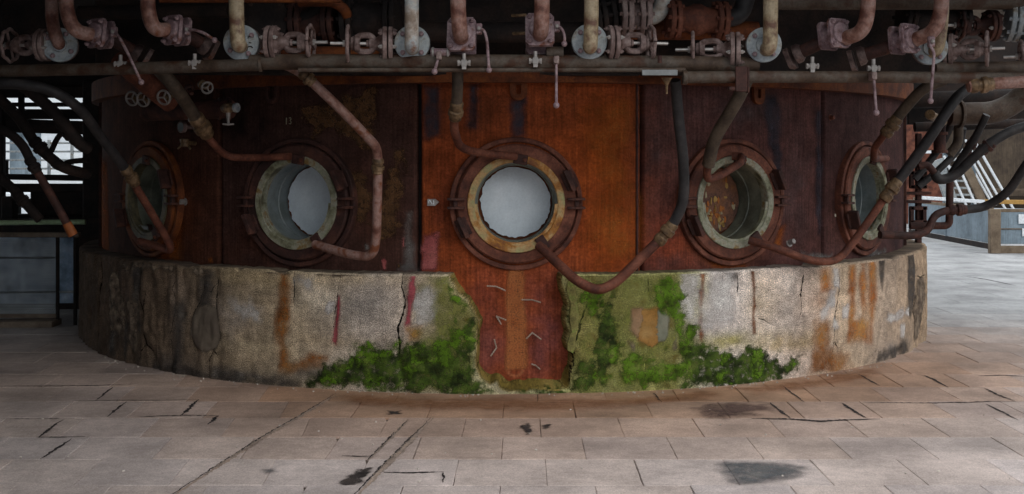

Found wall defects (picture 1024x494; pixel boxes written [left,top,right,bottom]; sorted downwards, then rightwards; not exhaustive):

rust [275,275,323,369]
crack [397,277,406,354]
damp [414,289,432,324]
spalling [450,274,569,391]
peeling [561,280,579,353]
crack [569,297,590,389]
damp [680,272,737,326]
rust [848,262,876,341]
damp [877,255,916,363]
damp [723,462,803,483]